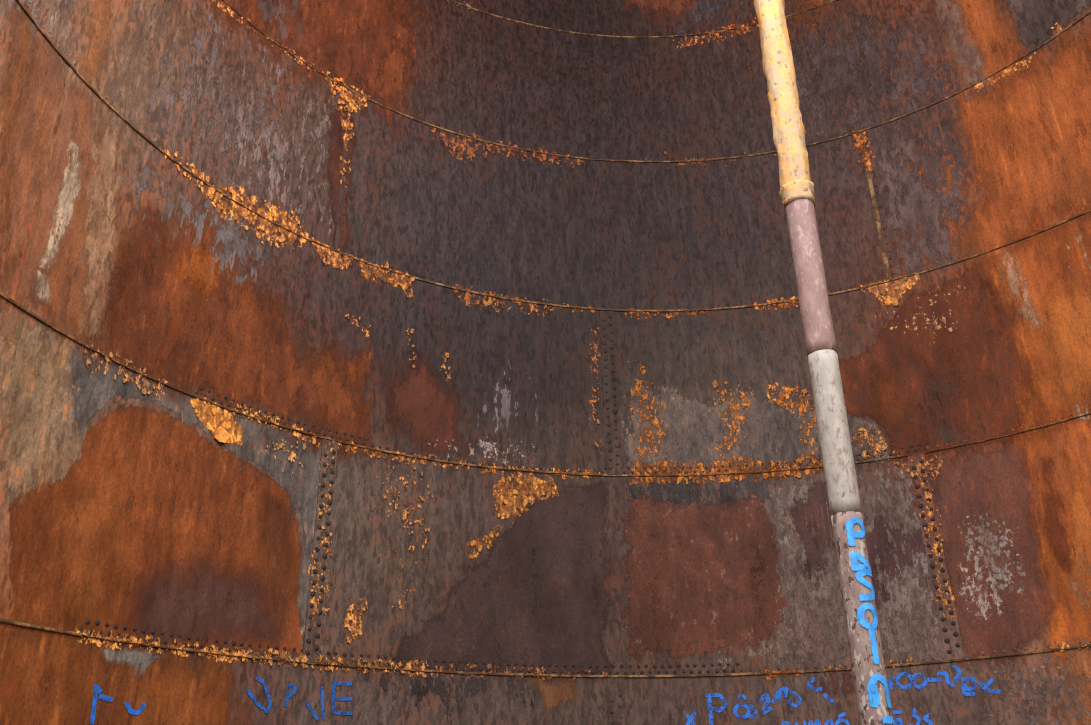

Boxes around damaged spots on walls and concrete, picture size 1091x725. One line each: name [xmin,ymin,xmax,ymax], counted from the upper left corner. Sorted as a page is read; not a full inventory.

corrosion [625,0,696,19]
corrosion [672,17,759,48]
corrosion [0,0,601,629]
corrosion [625,307,707,319]
corrosion [627,361,824,486]
corrosion [754,296,800,311]
peeling [789,0,1043,660]
corrosion [851,23,1091,725]
peeling [620,384,850,674]
corrosion [0,617,610,725]
corrosion [343,599,368,644]
corrosion [761,664,854,695]